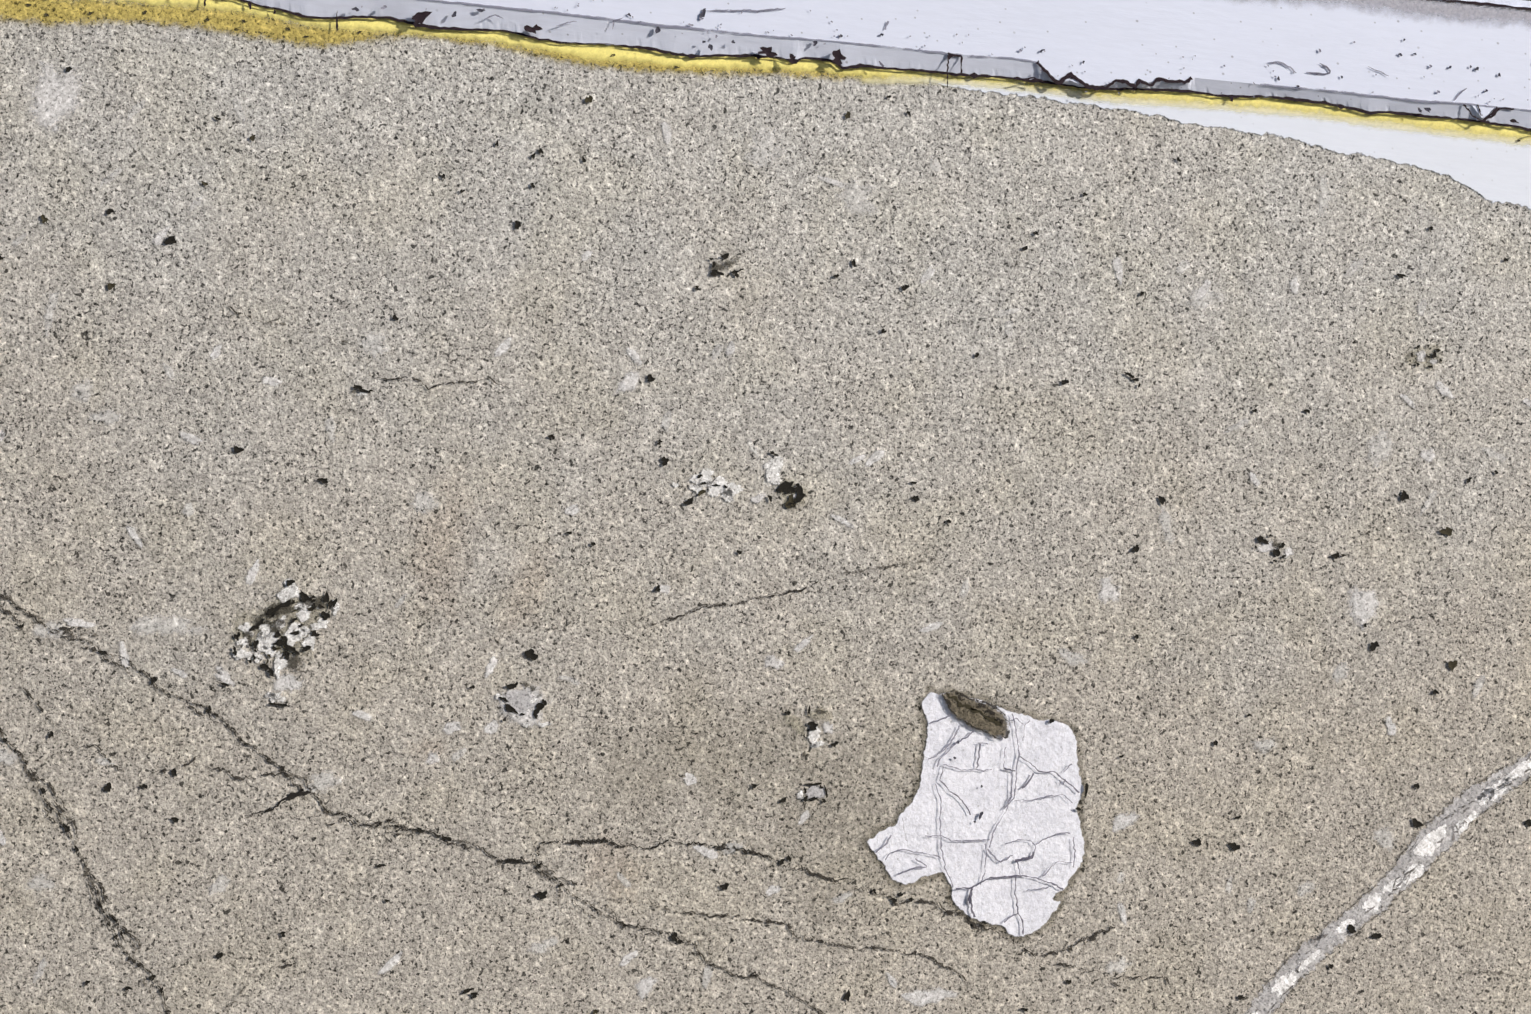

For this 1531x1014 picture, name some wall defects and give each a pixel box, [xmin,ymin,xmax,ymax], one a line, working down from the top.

peeling [924,81,1531,210]
spalling [215,578,340,707]
crack [545,554,948,630]
crack [0,594,1173,1014]
spalling [867,689,1088,937]
crack [1245,748,1531,1014]